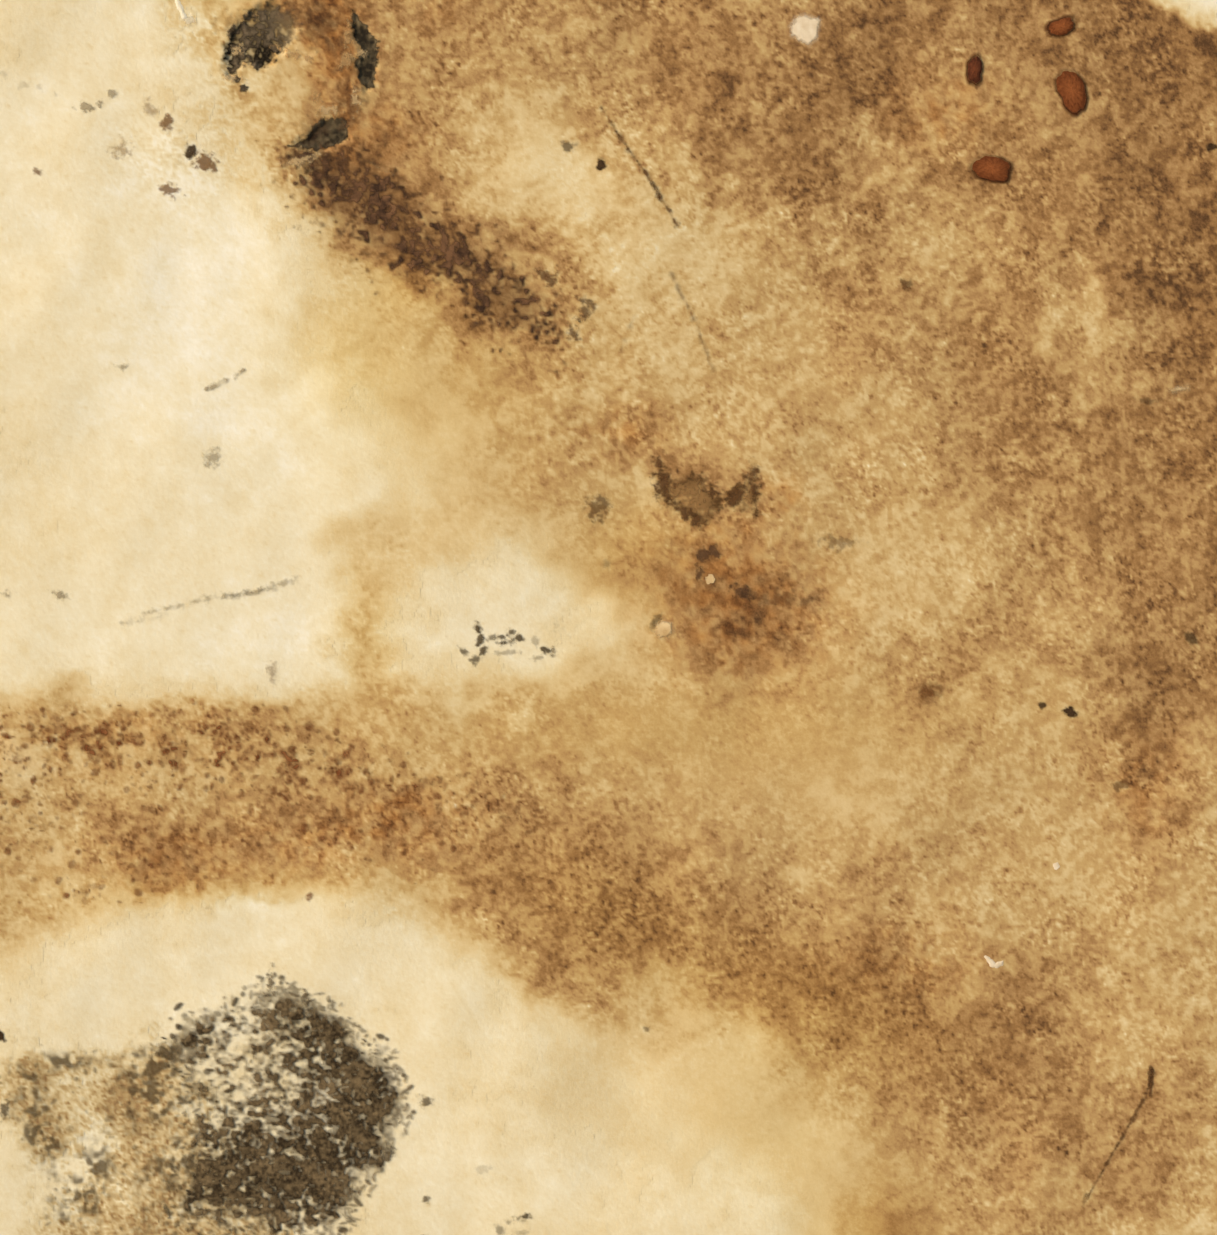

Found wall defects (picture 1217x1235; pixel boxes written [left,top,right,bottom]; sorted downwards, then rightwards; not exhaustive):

rust [1045,16,1074,37]
rust [965,54,982,86]
rust [1055,71,1088,116]
rust [971,156,1012,183]
water stain [393,236,408,253]
water stain [407,239,430,275]
water stain [424,222,494,315]
water stain [511,295,539,306]
water stain [469,889,483,906]
water stain [0,973,430,1235]